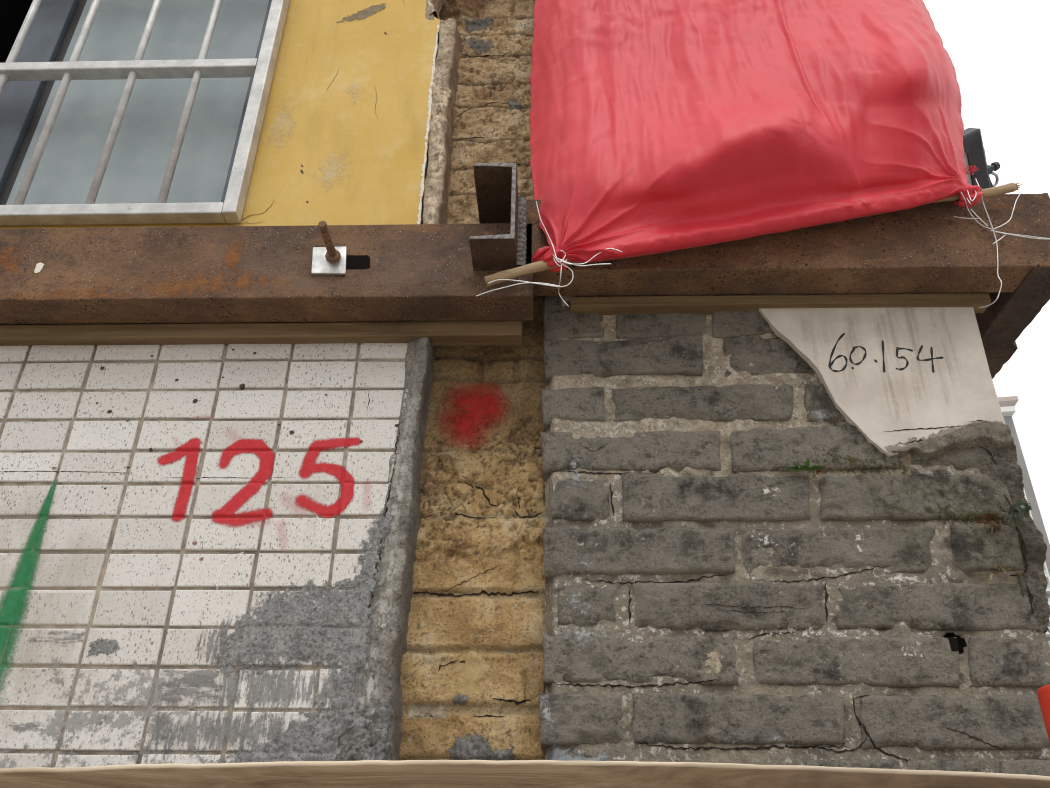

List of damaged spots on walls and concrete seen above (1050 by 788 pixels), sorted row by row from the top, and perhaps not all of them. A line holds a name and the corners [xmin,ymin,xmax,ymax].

crack [427,476,542,519]
crack [1004,495,1034,614]
crack [413,564,537,597]
crack [585,566,887,640]
peeling [943,632,967,654]
crack [473,679,718,717]
crack [639,695,911,760]
crack [947,728,1001,750]